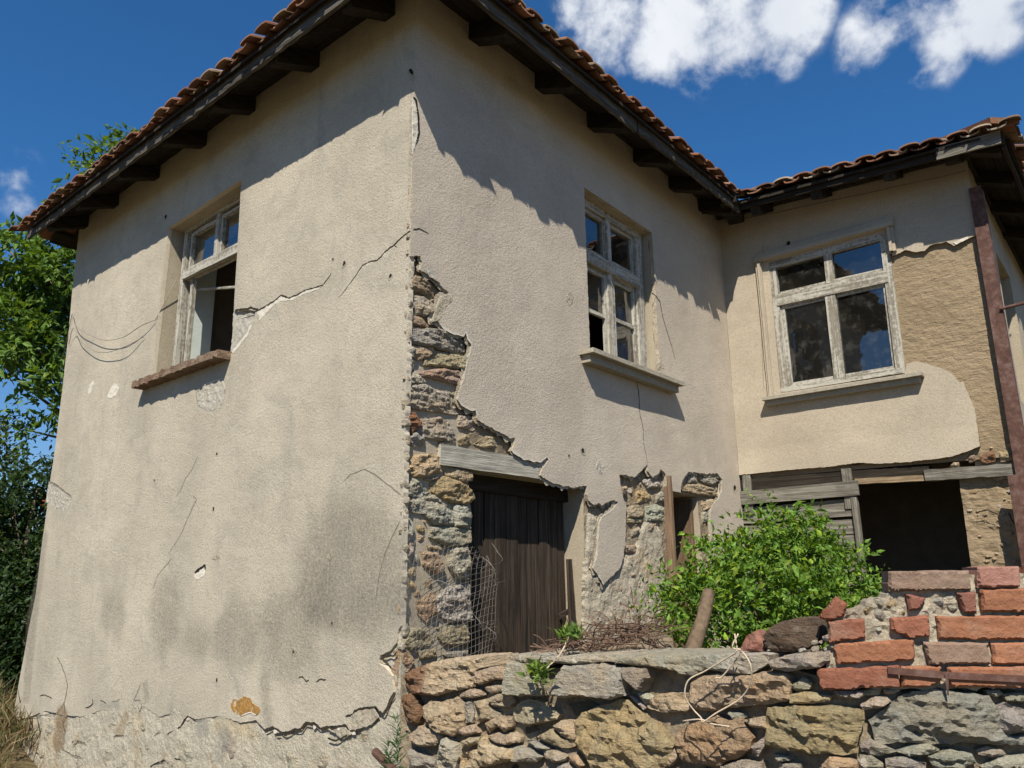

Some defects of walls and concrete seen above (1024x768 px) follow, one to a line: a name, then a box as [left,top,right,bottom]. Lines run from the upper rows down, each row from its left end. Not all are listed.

crack [235,228,428,320]
flaking render [391,210,668,686]
flaking render [681,472,737,572]
crack [30,657,142,757]
crack [150,716,201,767]
flaking render [231,697,260,716]
crack [265,692,395,742]